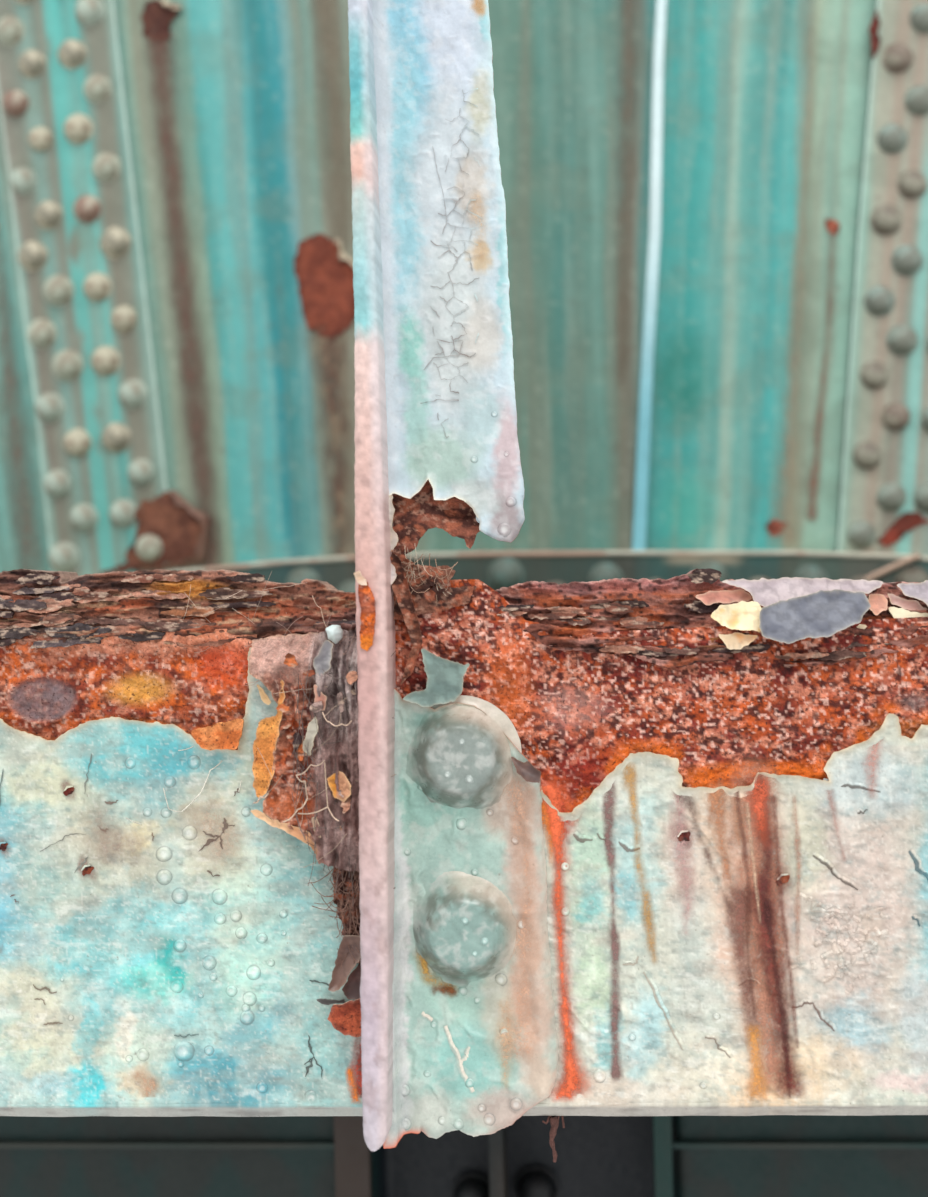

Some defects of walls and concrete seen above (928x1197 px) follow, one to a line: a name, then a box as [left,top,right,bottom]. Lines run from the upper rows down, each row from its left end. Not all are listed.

peeling [294,233,355,338]
crack [420,88,483,438]
corrosion [0,31,376,740]
corrosion [808,359,826,519]
peeling [100,489,211,573]
peeling [696,577,928,650]
peeling [191,625,361,1037]
corrosion [389,480,928,1099]
corrosion [347,1043,362,1101]
corrosion [542,1116,565,1162]